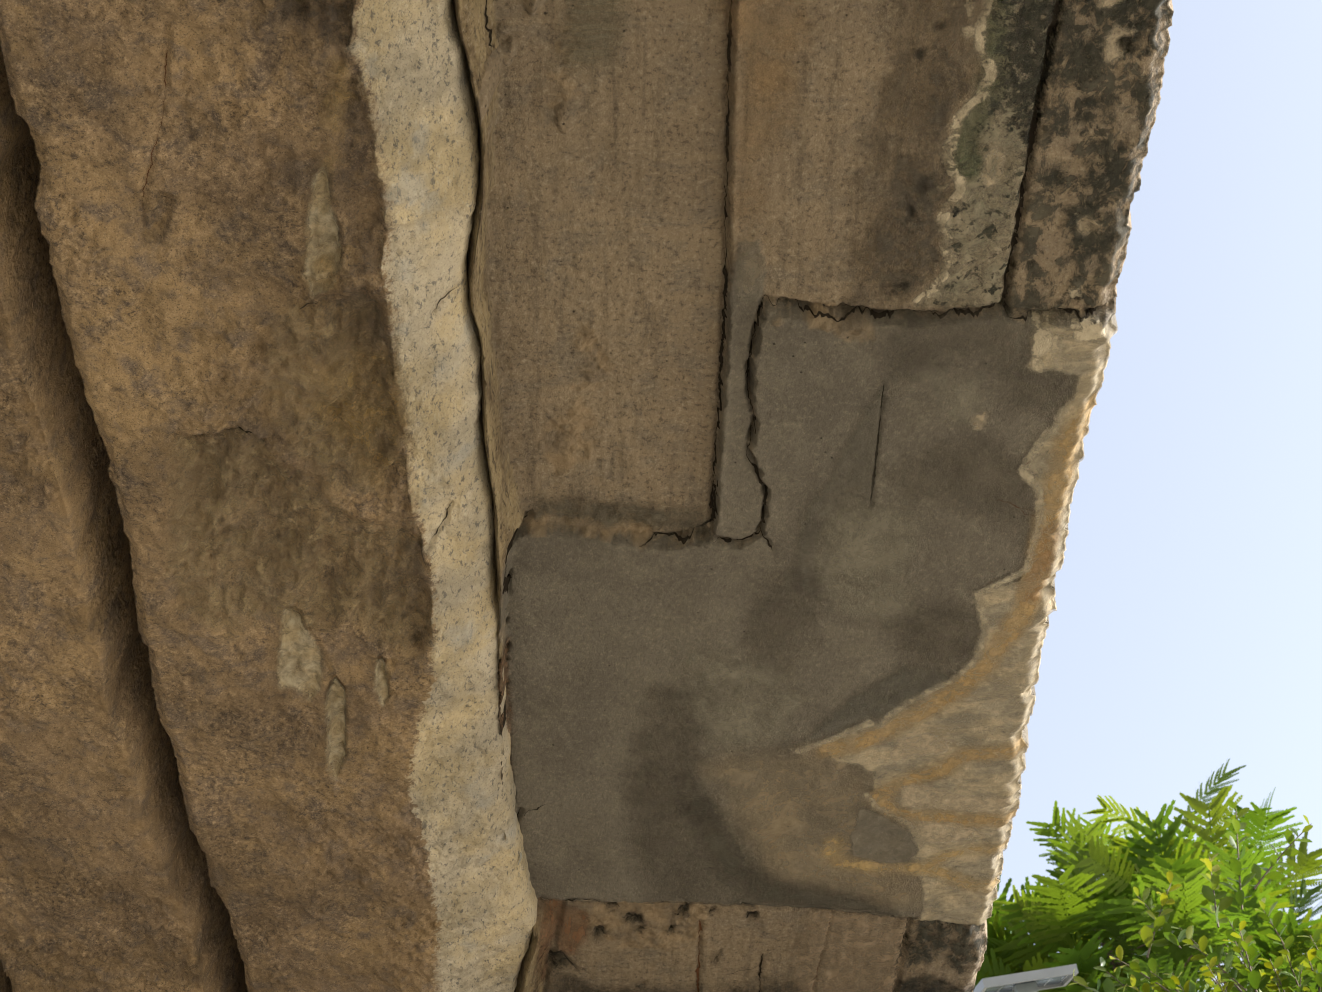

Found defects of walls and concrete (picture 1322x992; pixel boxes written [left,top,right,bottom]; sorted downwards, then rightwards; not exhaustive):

crack [640,0,1098,549]
water stain [636,0,1174,992]